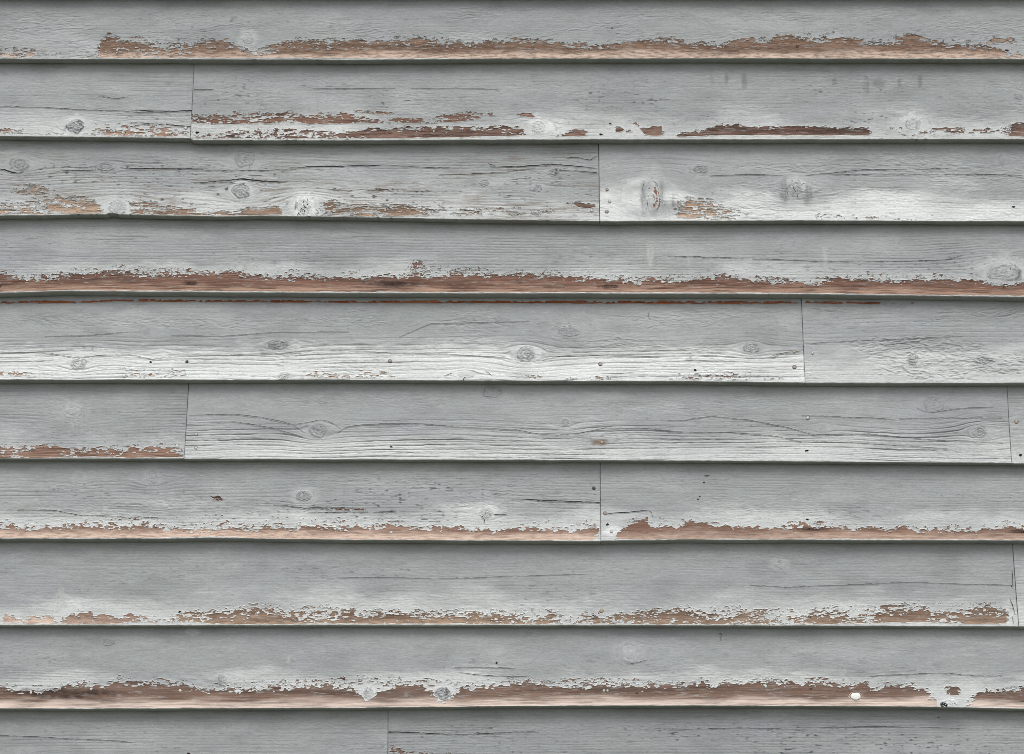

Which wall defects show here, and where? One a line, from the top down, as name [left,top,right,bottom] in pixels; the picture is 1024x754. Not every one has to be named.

peeling [85,30,1024,59]
peeling [84,109,535,140]
peeling [614,122,872,138]
peeling [0,183,104,215]
peeling [128,199,283,216]
peeling [318,188,596,217]
peeling [0,259,1024,305]
peeling [0,442,184,458]
peeling [0,495,600,541]
peeling [615,516,1024,540]
peeling [2,600,1010,625]
peeling [0,674,1024,709]